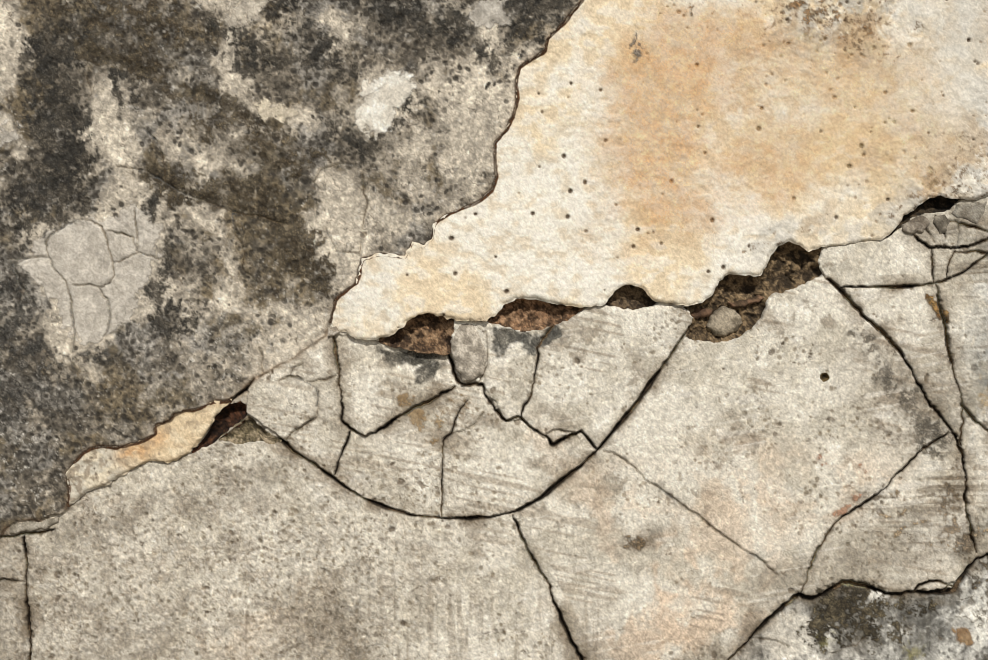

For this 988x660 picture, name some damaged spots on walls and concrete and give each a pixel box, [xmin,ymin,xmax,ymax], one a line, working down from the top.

water stain [335,0,476,54]
water stain [474,0,573,89]
water stain [0,0,380,299]
flaking render [328,0,988,355]
water stain [143,234,202,339]
peeling [9,516,60,534]
flaking render [65,399,282,507]
crack [261,325,773,660]
crack [728,215,988,660]
water stain [848,328,988,590]
crack [0,529,54,660]
water stain [796,580,938,655]